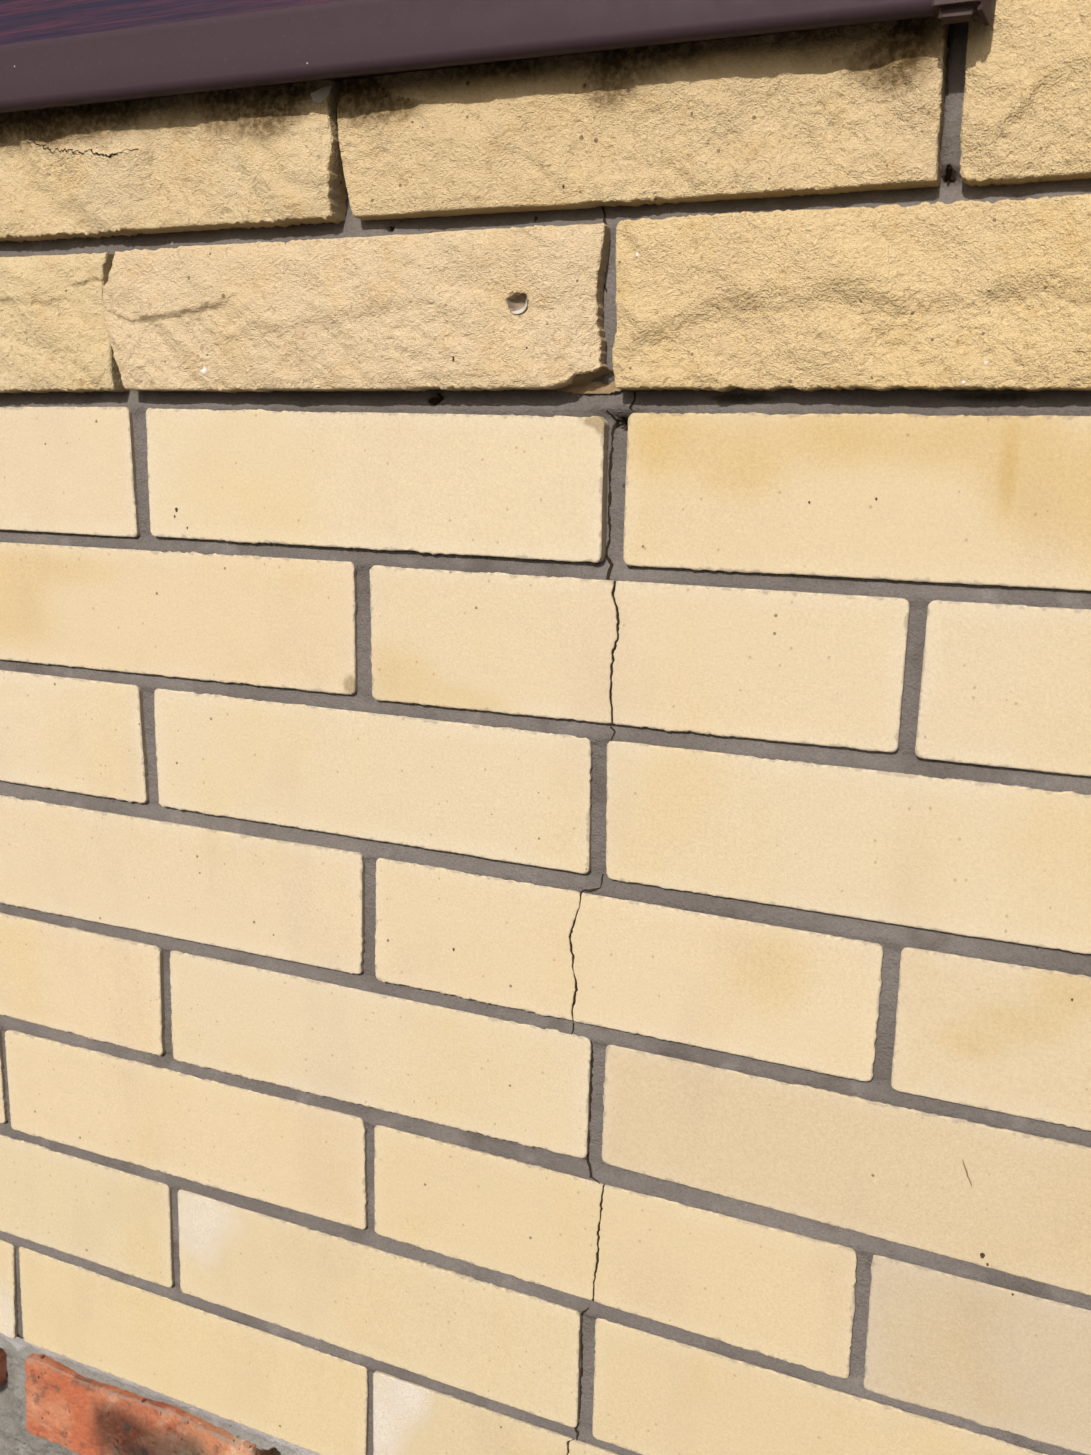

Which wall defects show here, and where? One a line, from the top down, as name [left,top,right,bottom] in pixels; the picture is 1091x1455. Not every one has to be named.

crack [605,391,636,740]
crack [567,874,605,1455]